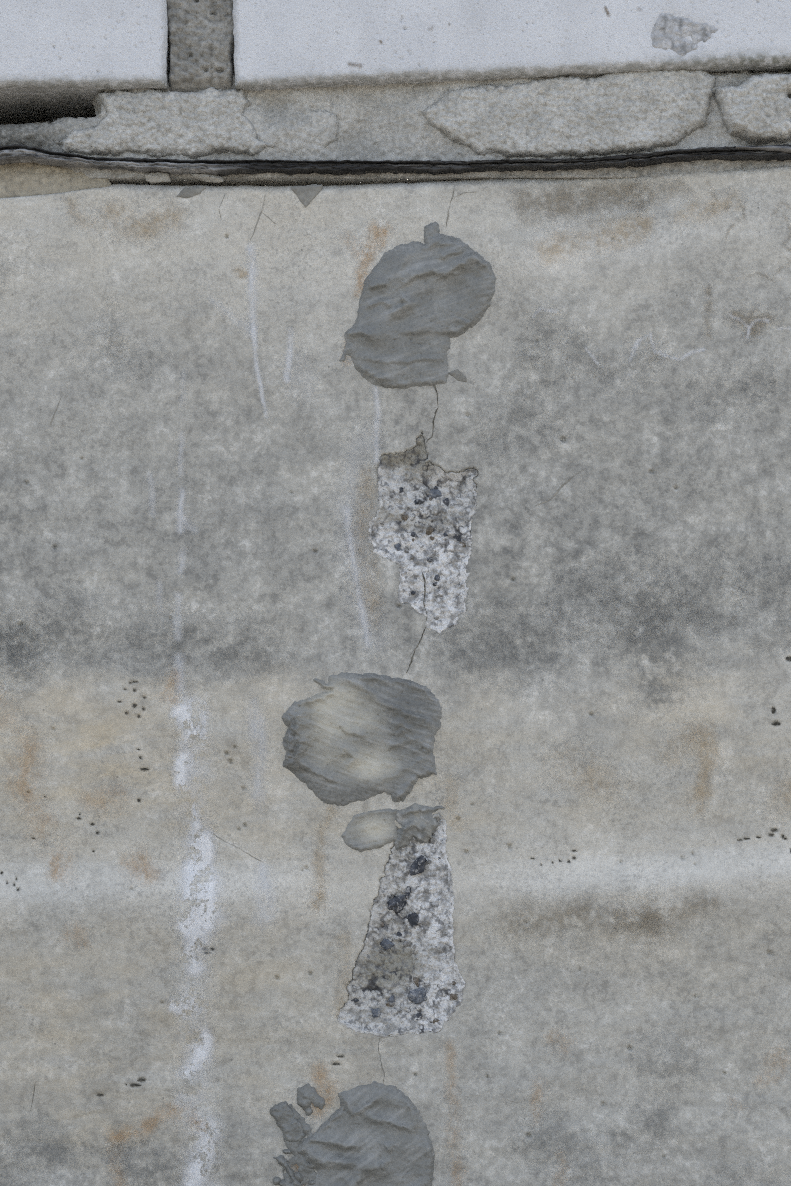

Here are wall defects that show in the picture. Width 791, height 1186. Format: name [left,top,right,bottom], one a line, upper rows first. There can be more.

spalling [651,13,718,56]
spalling [0,163,111,198]
spalling [368,432,478,634]
efflorescence [171,702,207,786]
efflorescence [178,806,218,974]
spalling [337,813,466,1038]
efflorescence [182,1031,213,1077]
efflorescence [185,1123,218,1186]